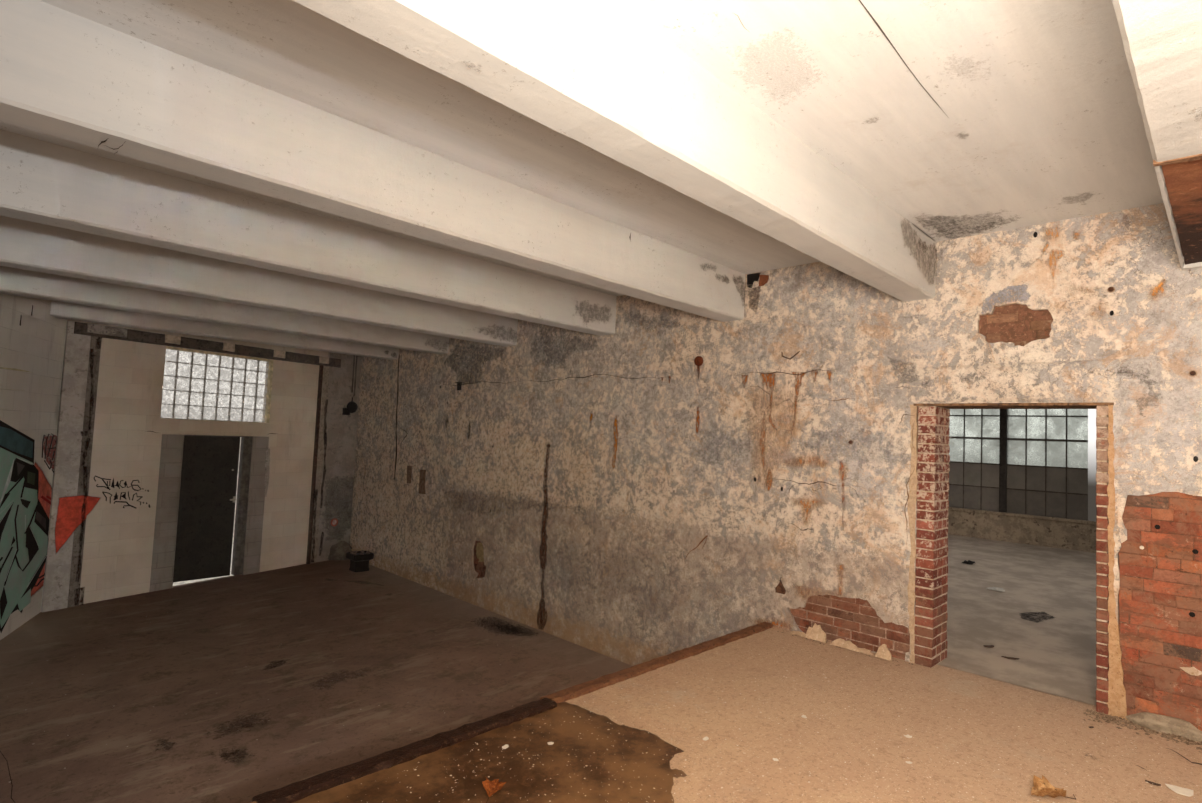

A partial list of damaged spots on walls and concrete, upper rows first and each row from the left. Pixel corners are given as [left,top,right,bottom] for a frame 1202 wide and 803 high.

crack [859,0,948,117]
spalling [1153,154,1202,265]
flaking render [979,285,1053,346]
corrosion [741,373,777,490]
corrosion [792,370,832,427]
corrosion [537,444,550,629]
flaking render [789,405,918,664]
flaking render [1107,405,1202,731]
damp [293,701,687,803]